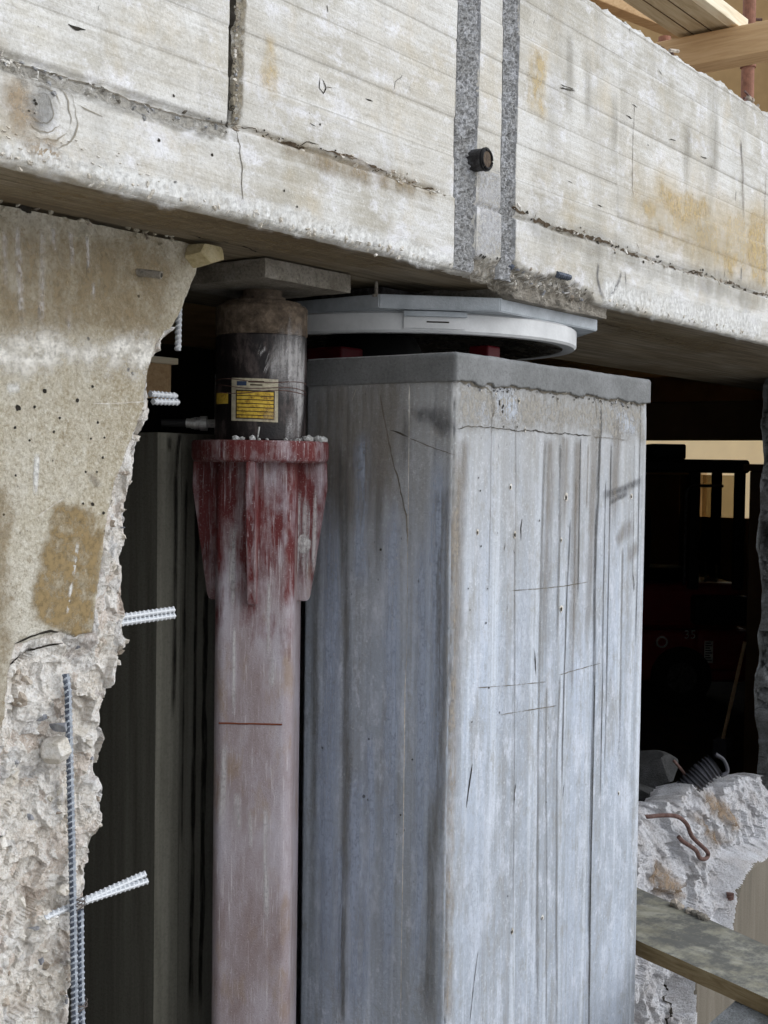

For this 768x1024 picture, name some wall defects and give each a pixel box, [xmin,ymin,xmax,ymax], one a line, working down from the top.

crack [221,0,450,196]
spalling [152,309,182,357]
spalling [468,254,762,336]
crack [512,203,768,296]
crack [459,381,647,440]
crack [380,395,455,541]
damp [34,506,102,637]
crack [10,630,63,665]
spalling [0,383,180,1024]
spalling [644,813,710,861]